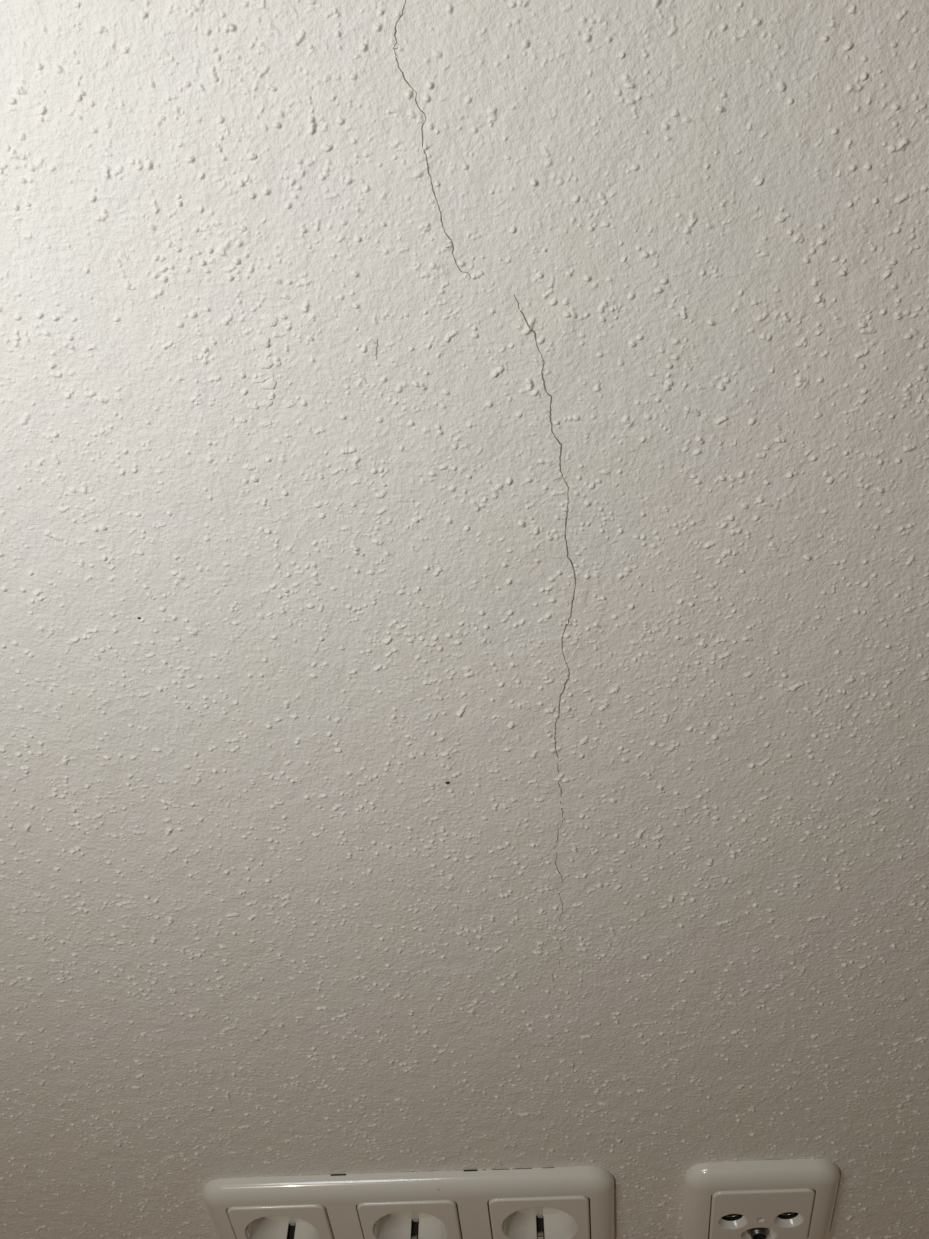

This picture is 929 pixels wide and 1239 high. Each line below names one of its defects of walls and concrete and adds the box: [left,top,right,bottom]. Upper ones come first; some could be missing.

crack [393,0,471,277]
crack [514,294,576,982]